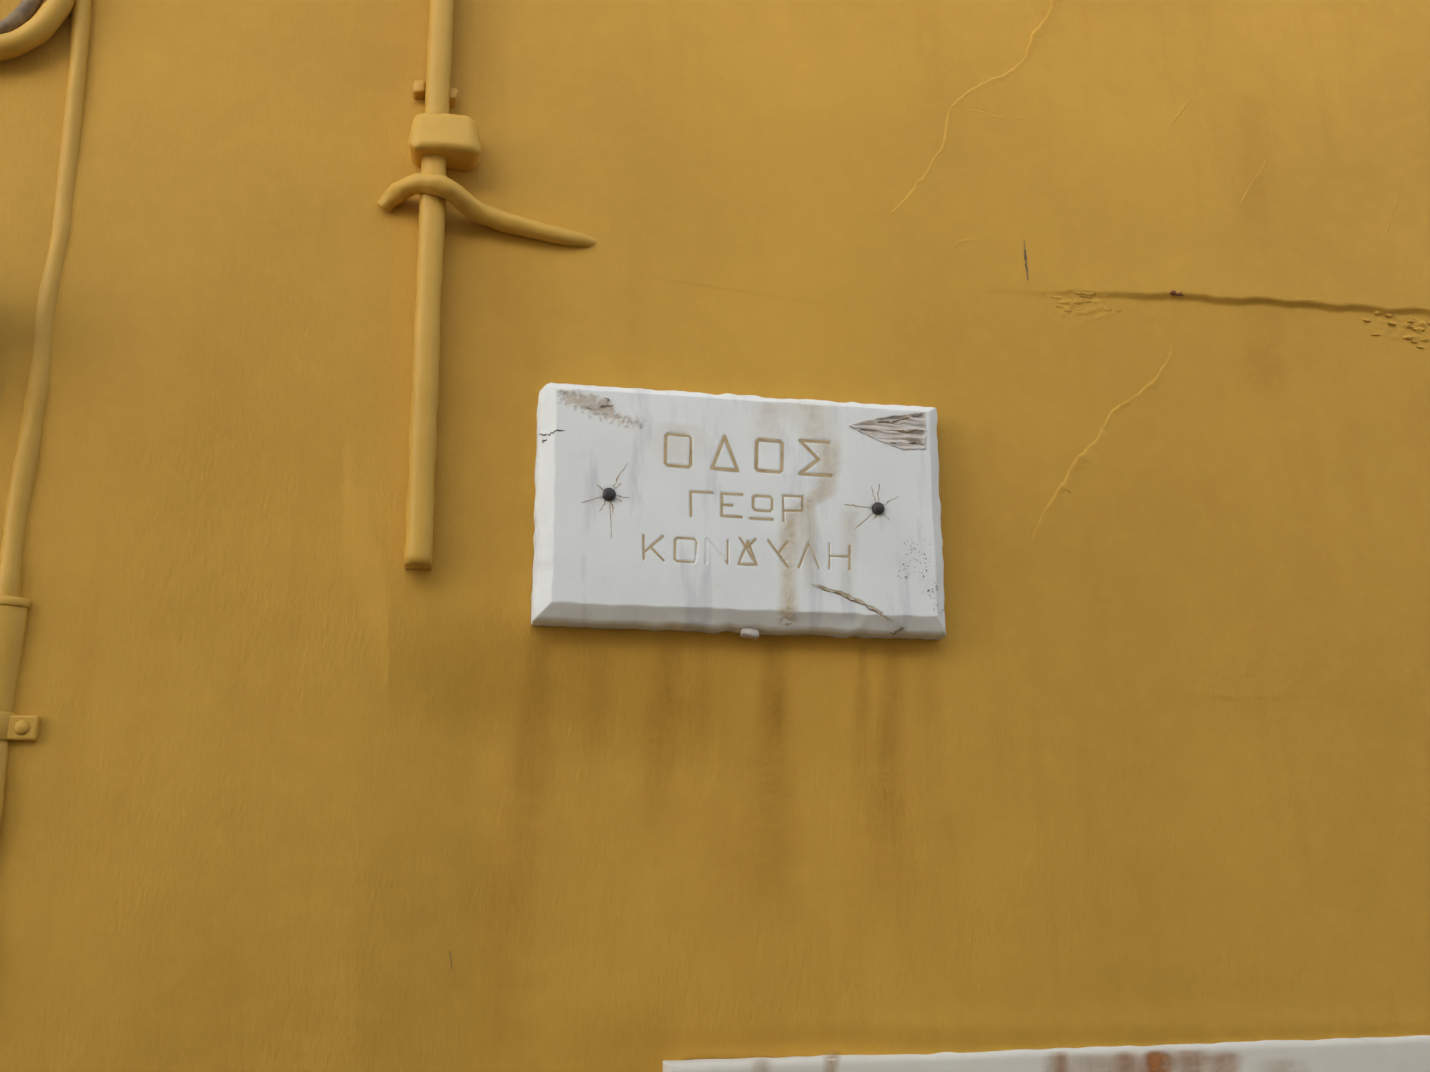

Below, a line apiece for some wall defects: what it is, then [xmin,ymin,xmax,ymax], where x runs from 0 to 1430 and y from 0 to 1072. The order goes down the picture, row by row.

crack [891,0,1063,214]
spalling [849,412,927,450]
crack [1032,346,1176,540]
rust [1147,1053,1170,1072]